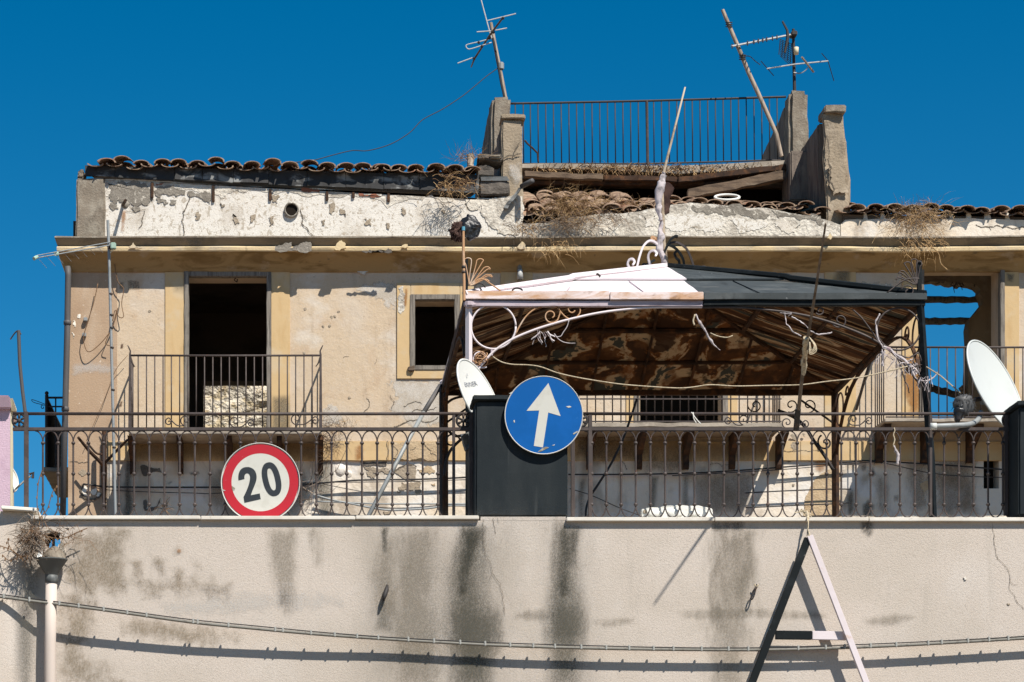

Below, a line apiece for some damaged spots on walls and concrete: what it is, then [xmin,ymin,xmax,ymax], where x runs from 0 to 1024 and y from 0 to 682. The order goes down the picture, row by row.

peeling [107,180,256,224]
spalling [275,242,312,253]
flaking render [465,195,526,250]
peeling [645,204,832,240]
peeling [363,441,437,494]
leakage [454,528,491,679]
leakage [551,533,578,681]